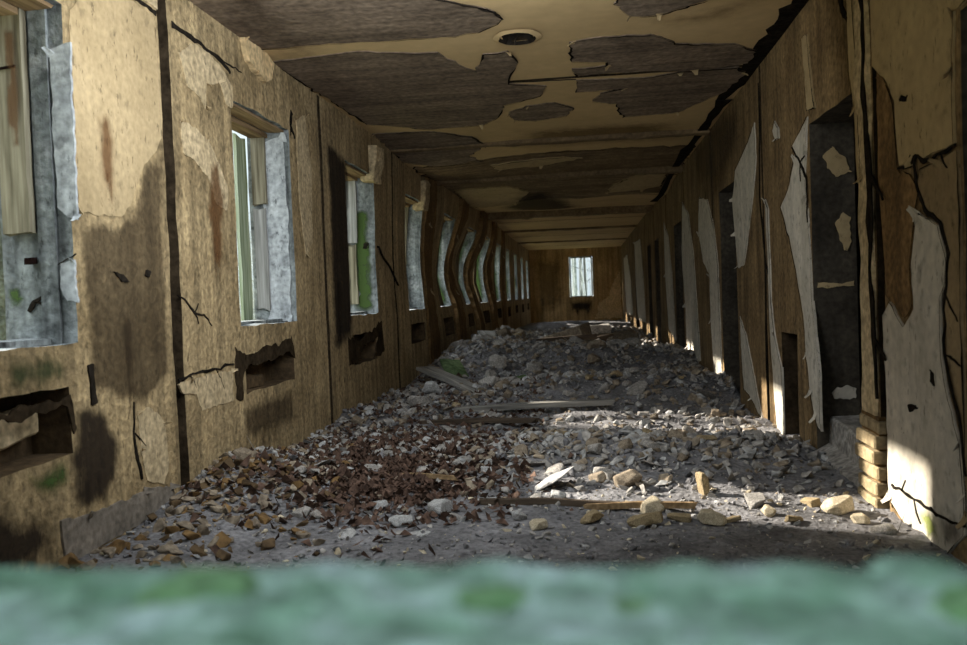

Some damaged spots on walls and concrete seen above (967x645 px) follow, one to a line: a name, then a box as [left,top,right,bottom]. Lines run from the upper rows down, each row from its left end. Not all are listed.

peeling [68,0,162,221]
leakage [88,165,166,396]
crack [135,0,242,74]
peeling [188,0,707,205]
peeling [663,197,723,374]
crack [650,0,809,420]
peeling [729,33,823,435]
crack [838,0,887,399]
peeling [868,0,967,554]
crack [897,143,967,477]
leakage [73,409,117,505]
crack [891,480,966,528]